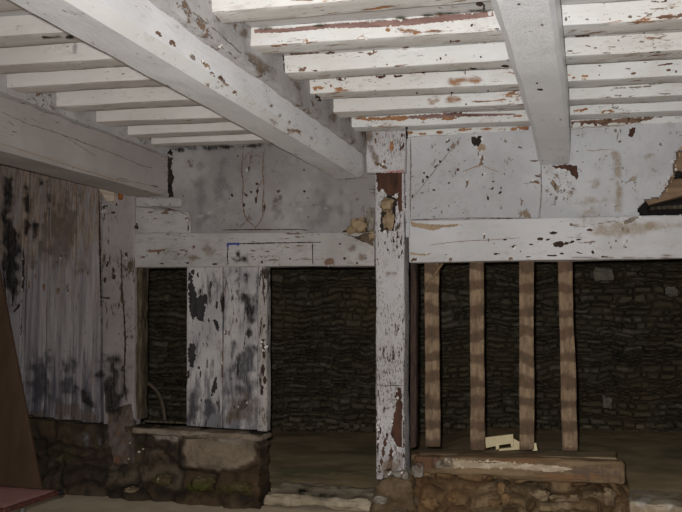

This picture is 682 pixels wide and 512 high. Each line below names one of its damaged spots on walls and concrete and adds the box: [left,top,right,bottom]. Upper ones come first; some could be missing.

peeling [254,2,494,44]
peeling [355,110,527,152]
peeling [571,108,663,143]
spalling [552,164,578,180]
peeling [342,160,432,262]
damp [2,177,79,295]
peeling [529,231,581,256]
damp [241,293,255,337]
damp [56,360,96,422]
damp [95,356,126,414]
damp [232,346,258,392]
peeling [376,387,406,477]